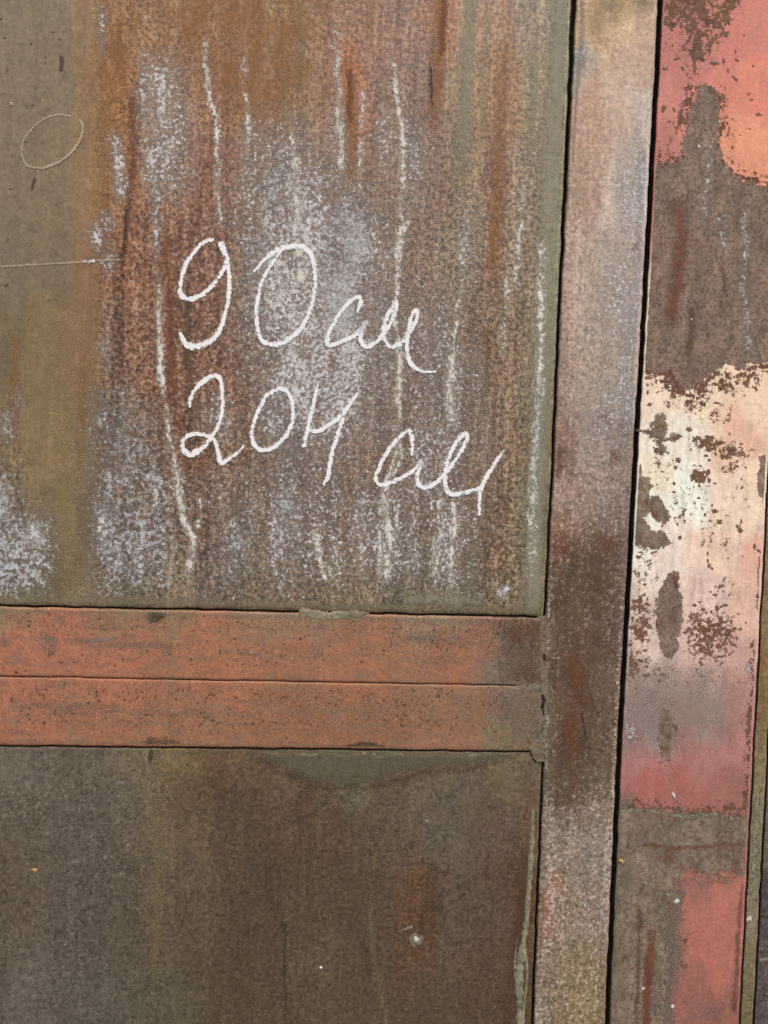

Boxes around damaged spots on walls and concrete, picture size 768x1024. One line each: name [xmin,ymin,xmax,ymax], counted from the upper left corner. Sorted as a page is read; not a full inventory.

corrosion [430,0,447,106]
peeling [662,0,741,82]
corrosion [347,73,355,171]
corrosion [114,102,137,267]
corrosion [165,291,192,411]
peeling [627,389,766,705]